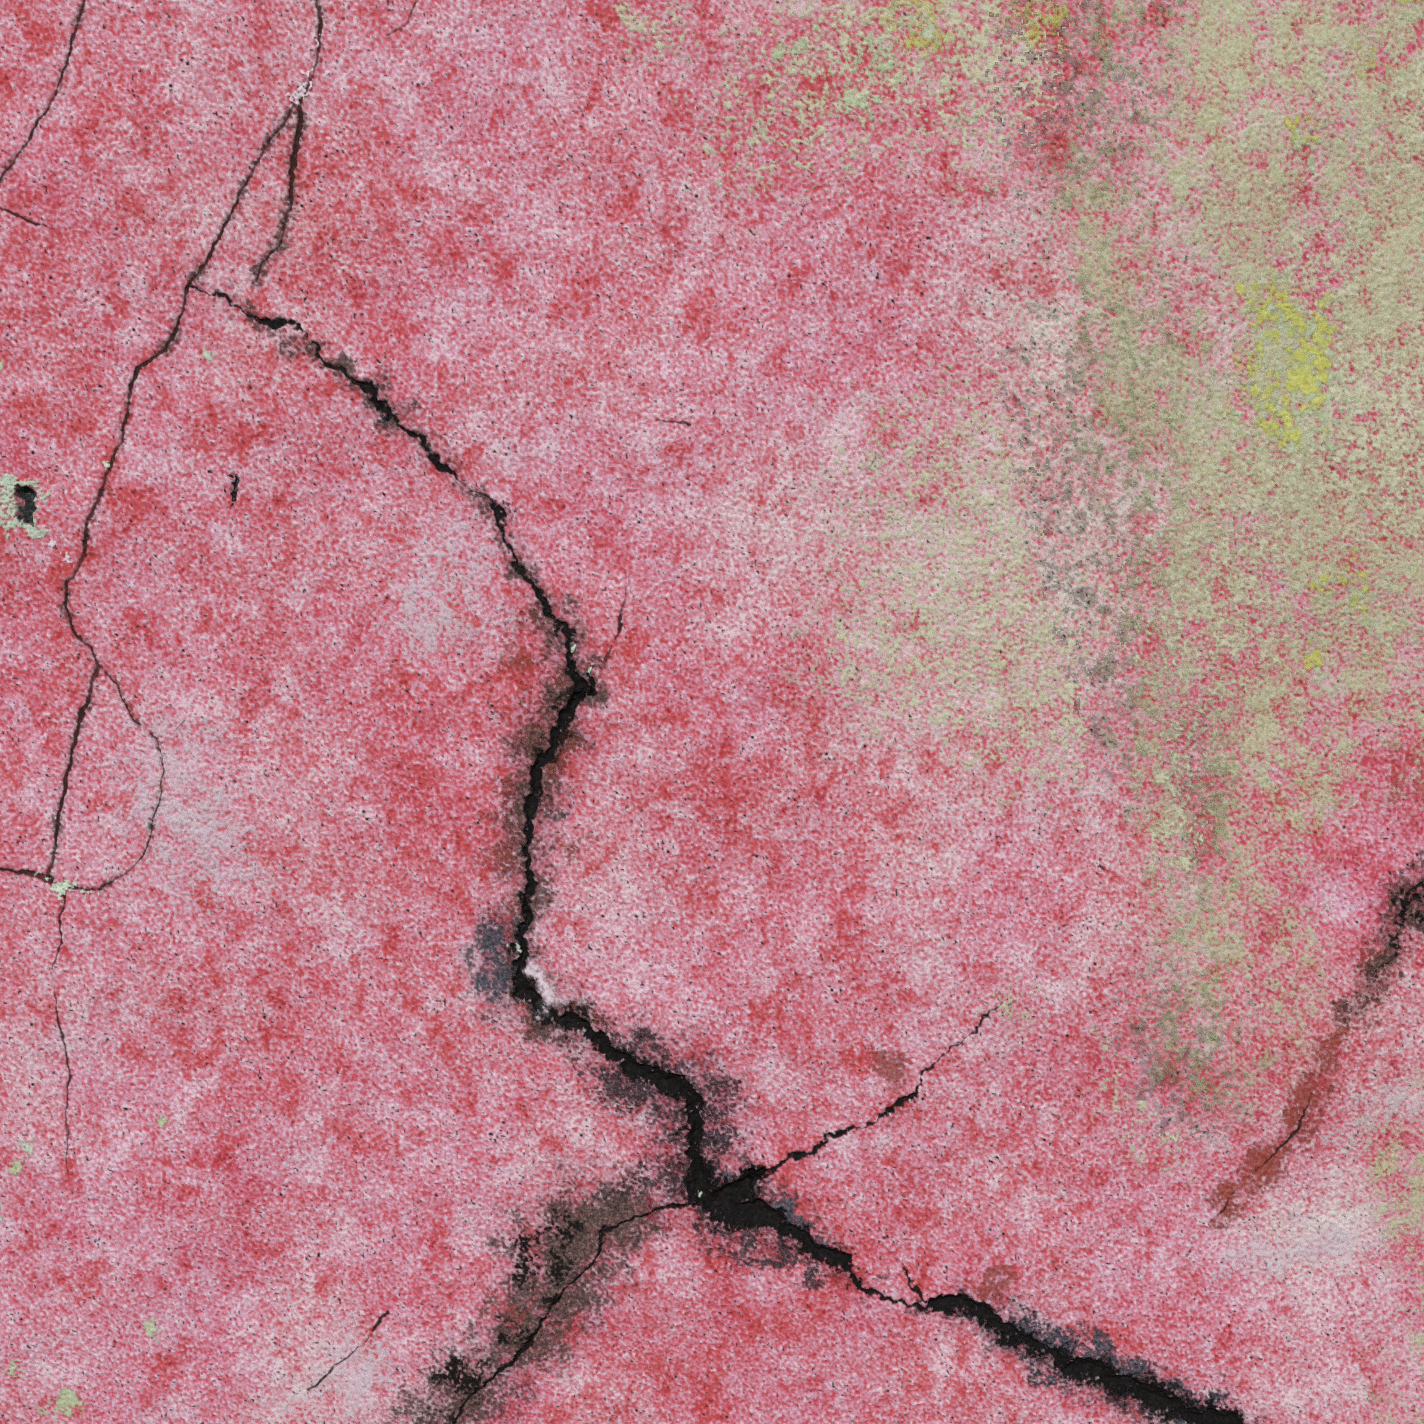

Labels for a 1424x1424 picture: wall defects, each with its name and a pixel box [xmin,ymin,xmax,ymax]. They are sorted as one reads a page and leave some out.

crack [0,0,461,966]
crack [54,994,71,1171]
crack [391,483,1244,1424]
crack [1205,851,1424,1229]
crack [307,1310,389,1391]